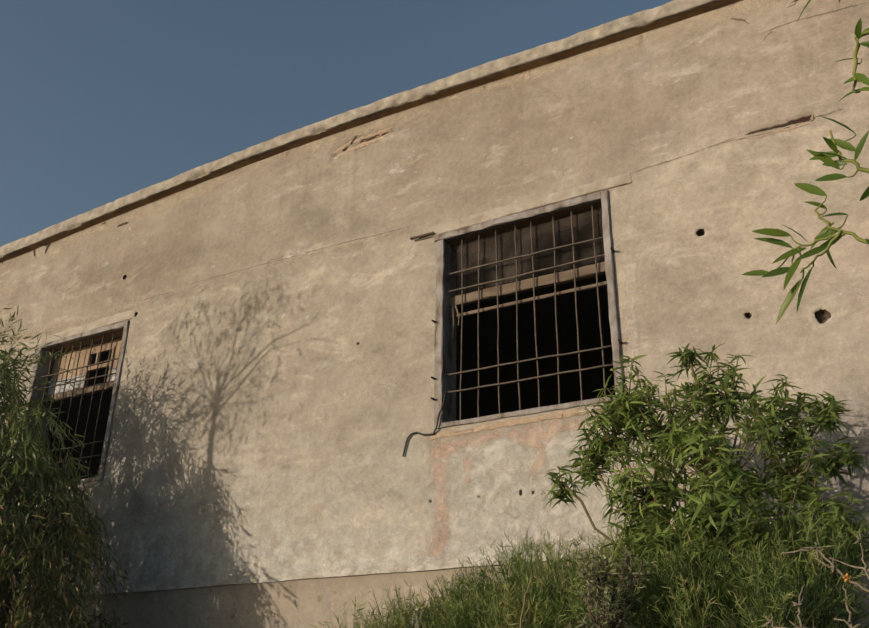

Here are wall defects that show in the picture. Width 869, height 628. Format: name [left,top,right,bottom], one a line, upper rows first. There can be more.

crack [731,0,868,40]
flaking render [737,115,815,140]
flaking render [332,128,393,159]
spalling [807,303,837,328]